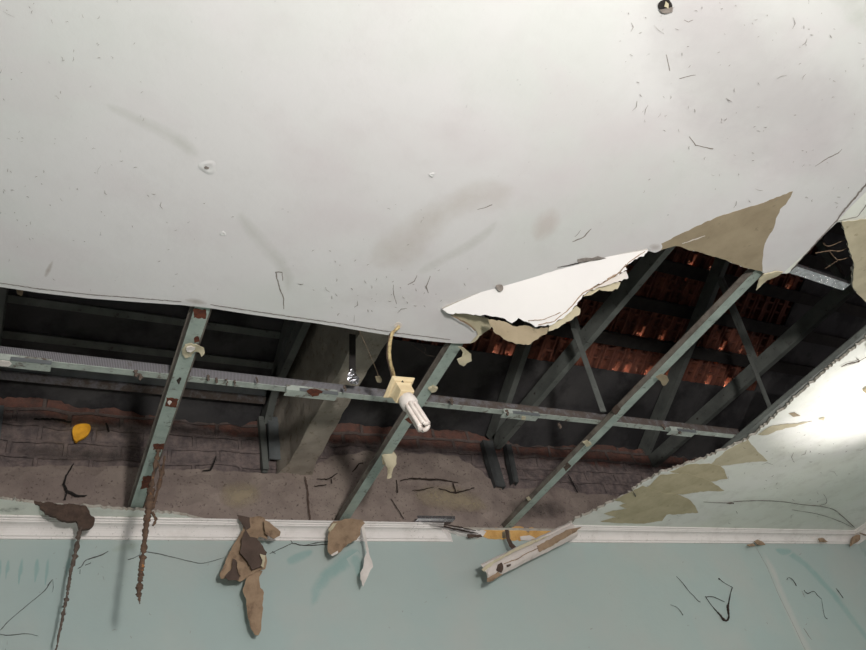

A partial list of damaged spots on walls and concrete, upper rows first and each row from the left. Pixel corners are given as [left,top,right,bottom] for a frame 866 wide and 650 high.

peeling [661,191,793,272]
peeling [758,422,807,435]
peeling [601,440,767,524]